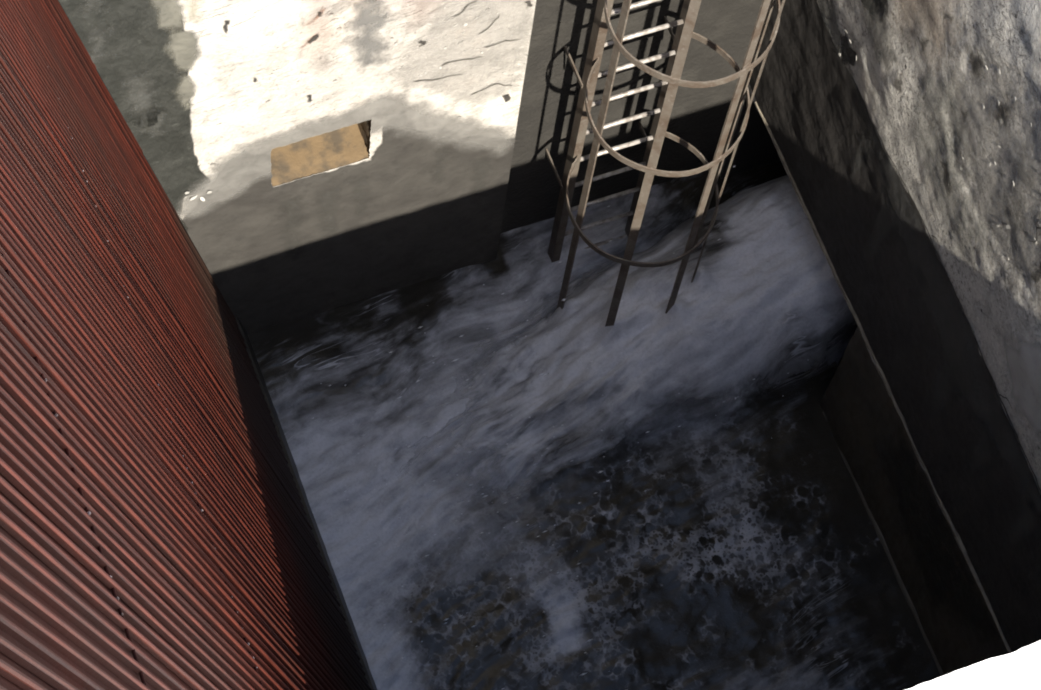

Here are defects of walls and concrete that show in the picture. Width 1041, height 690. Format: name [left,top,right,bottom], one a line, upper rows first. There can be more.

leakage [58,0,515,334]
leakage [749,0,1041,675]